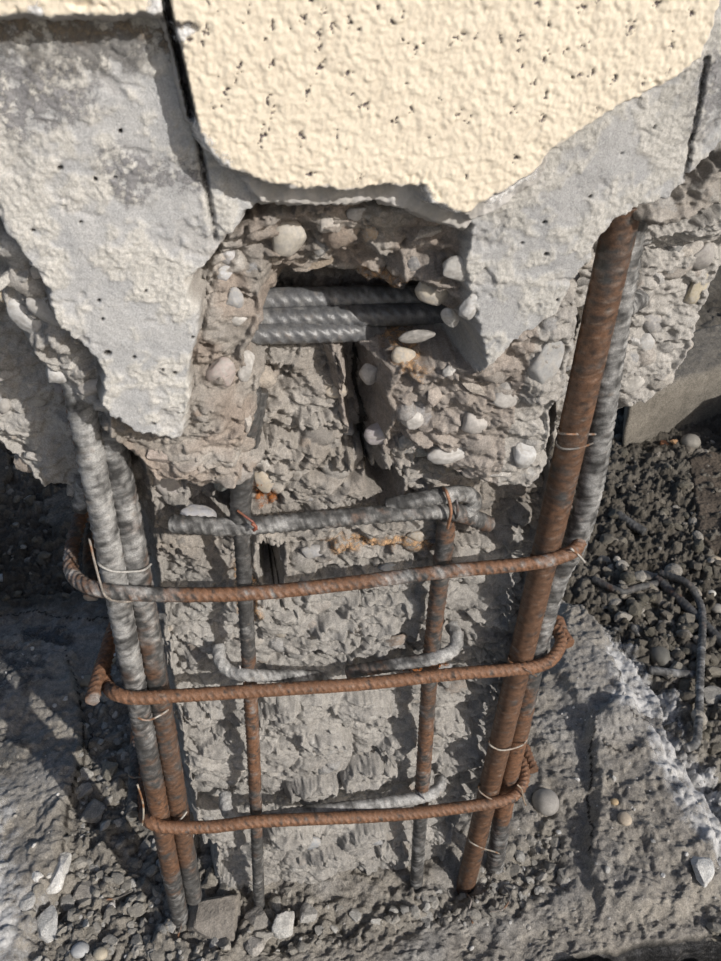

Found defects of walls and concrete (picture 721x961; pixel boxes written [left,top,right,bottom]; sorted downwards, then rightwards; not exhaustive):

flaking render [147,0,165,17]
spalling [0,141,721,669]
corrosion [382,326,426,379]
corrosion [255,485,277,507]
corrosion [330,534,432,555]
spalling [106,599,170,691]
crack [61,650,93,851]
spalling [126,703,191,821]
spalling [414,682,438,807]
spalling [456,672,543,894]
damp [603,628,721,869]
spalling [153,832,202,930]